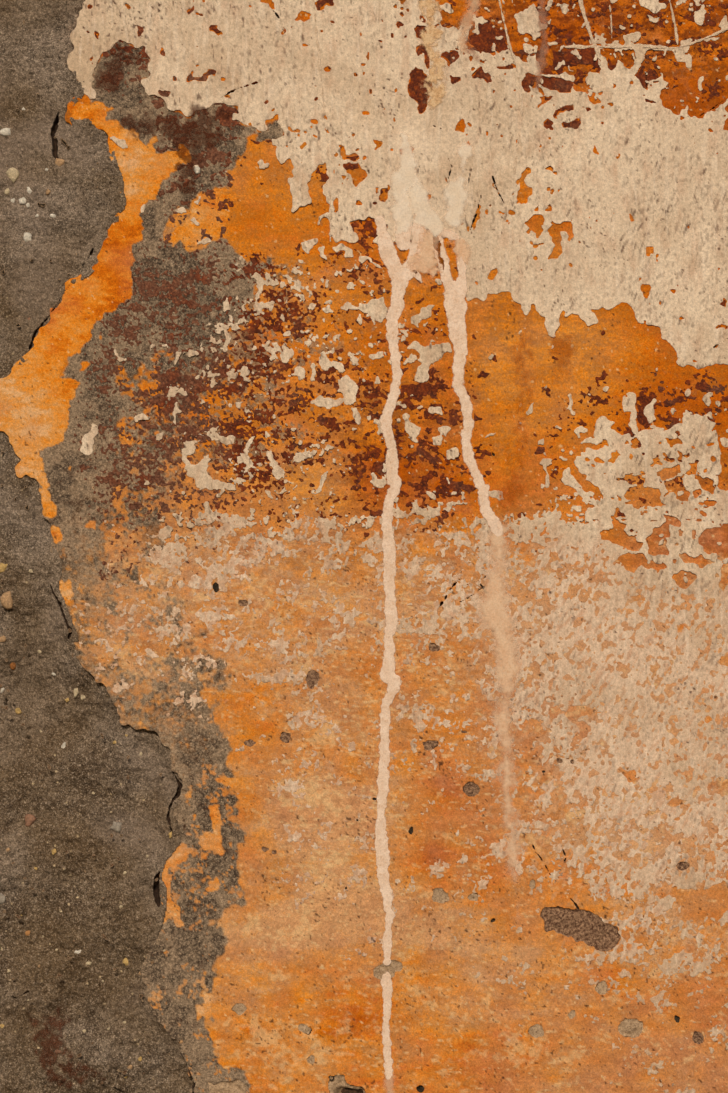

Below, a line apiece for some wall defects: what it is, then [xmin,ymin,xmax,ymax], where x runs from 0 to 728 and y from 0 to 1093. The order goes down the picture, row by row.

peeling [379,0,728,152]
crack [51,114,59,159]
peeling [461,167,581,271]
peeling [391,236,728,608]
spalling [0,0,393,1093]
leakage [374,133,520,1093]
crack [167,771,183,831]
crack [153,872,161,907]
spalling [429,859,451,903]
spalling [540,906,624,951]